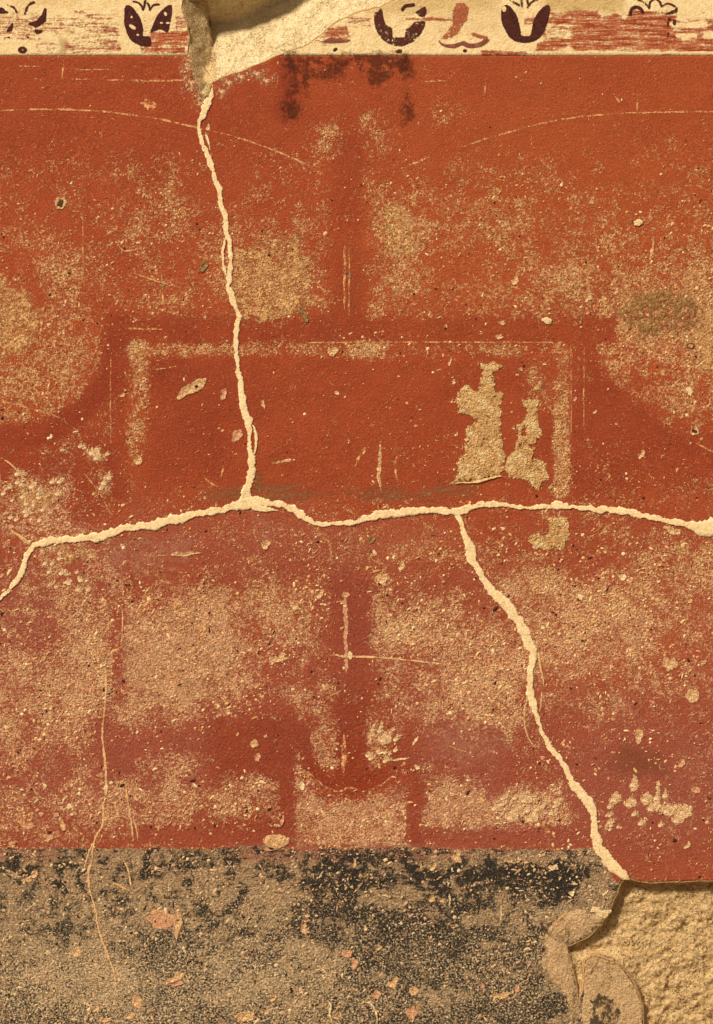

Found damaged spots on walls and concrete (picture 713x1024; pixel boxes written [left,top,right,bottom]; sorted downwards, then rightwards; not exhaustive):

flaking render [179,0,394,106]
crack [0,85,713,880]
peeling [450,361,555,491]
crack [84,668,138,991]
flaking render [565,878,713,1024]